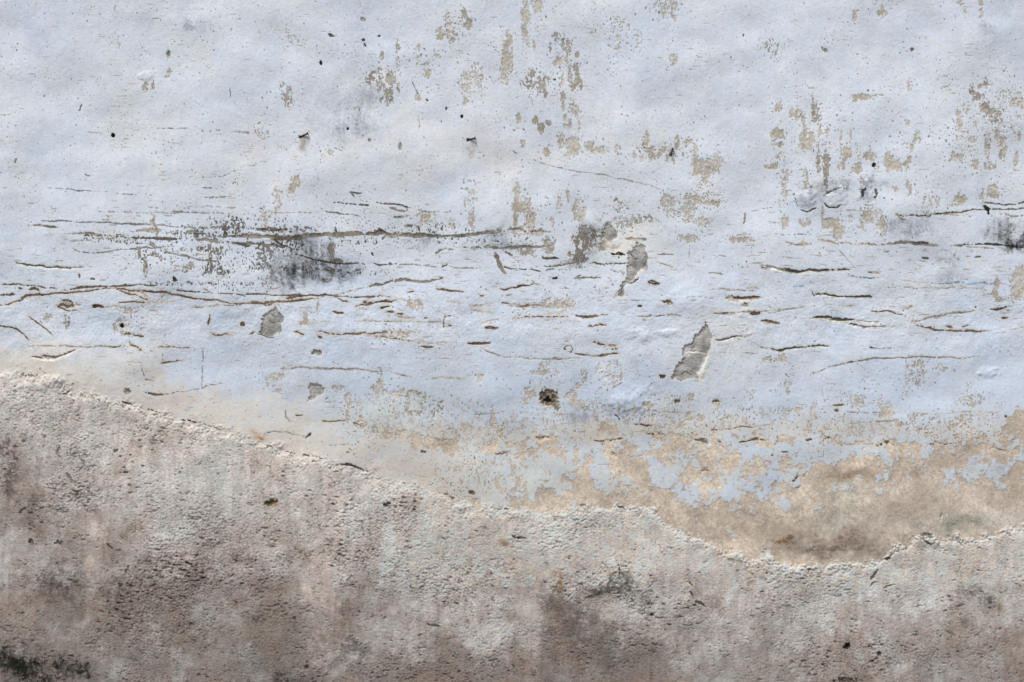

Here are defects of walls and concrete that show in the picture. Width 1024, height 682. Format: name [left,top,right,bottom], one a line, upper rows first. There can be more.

peeling [499,0,725,184]
peeling [764,97,1000,255]
peeling [950,77,1024,174]
crack [122,333,227,412]
spalling [258,303,284,338]
crack [0,187,815,348]
spalling [307,180,720,298]
crack [812,347,974,400]
crack [775,201,1024,321]
peeling [308,319,1024,567]
crack [869,532,935,588]
damp [0,647,90,682]